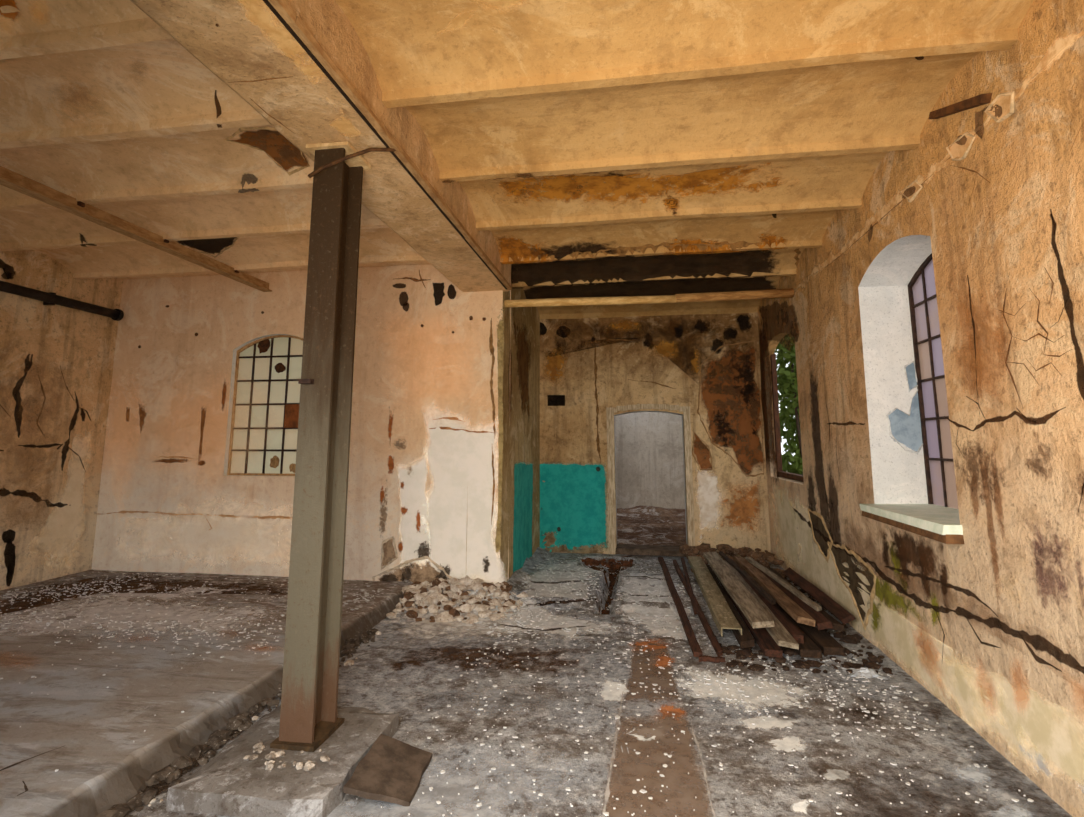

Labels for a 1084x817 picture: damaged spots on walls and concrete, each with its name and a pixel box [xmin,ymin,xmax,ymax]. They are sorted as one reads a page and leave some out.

spalling [224,127,310,176]
spalling [533,241,779,263]
crack [0,354,91,472]
spalling [495,307,505,552]
damp [544,319,715,381]
spalling [692,301,799,477]
crack [944,209,1084,454]
crack [0,488,71,507]
spalling [372,536,453,583]
damp [723,484,760,530]
damp [729,320,1084,817]
crack [792,396,1084,674]